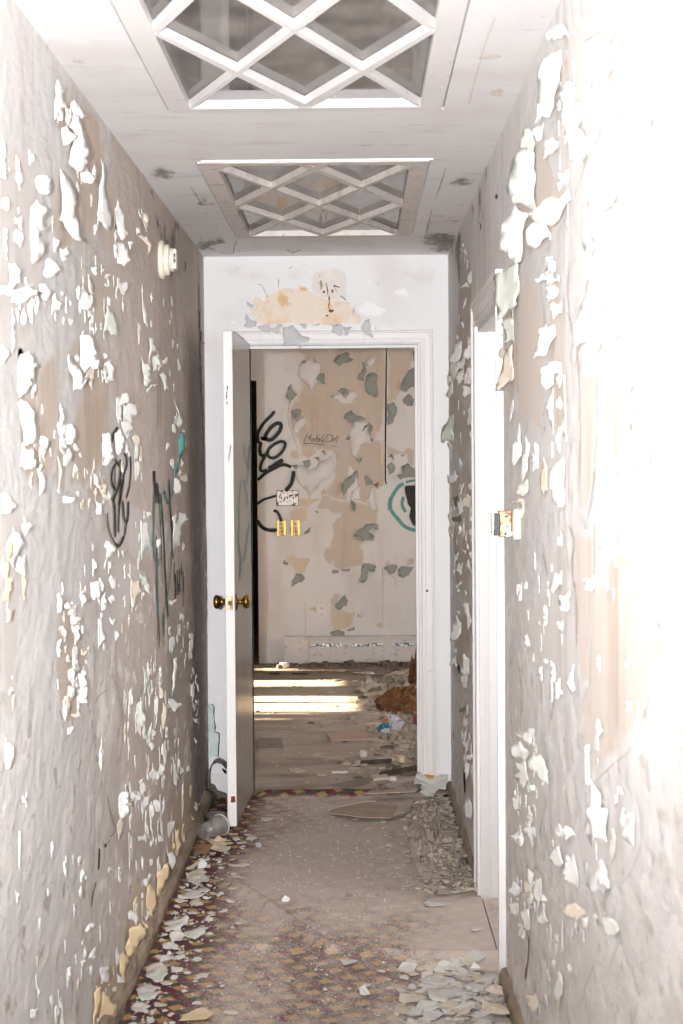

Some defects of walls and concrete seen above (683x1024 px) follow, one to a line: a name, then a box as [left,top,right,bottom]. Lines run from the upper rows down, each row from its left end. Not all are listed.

peeling [18,831,30,876]
peeling [0,77,190,777]
peeling [30,594,227,1024]
peeling [244,267,416,587]
peeling [330,592,362,636]
peeling [440,239,473,821]
peeling [493,0,627,521]
peeling [507,356,677,1023]